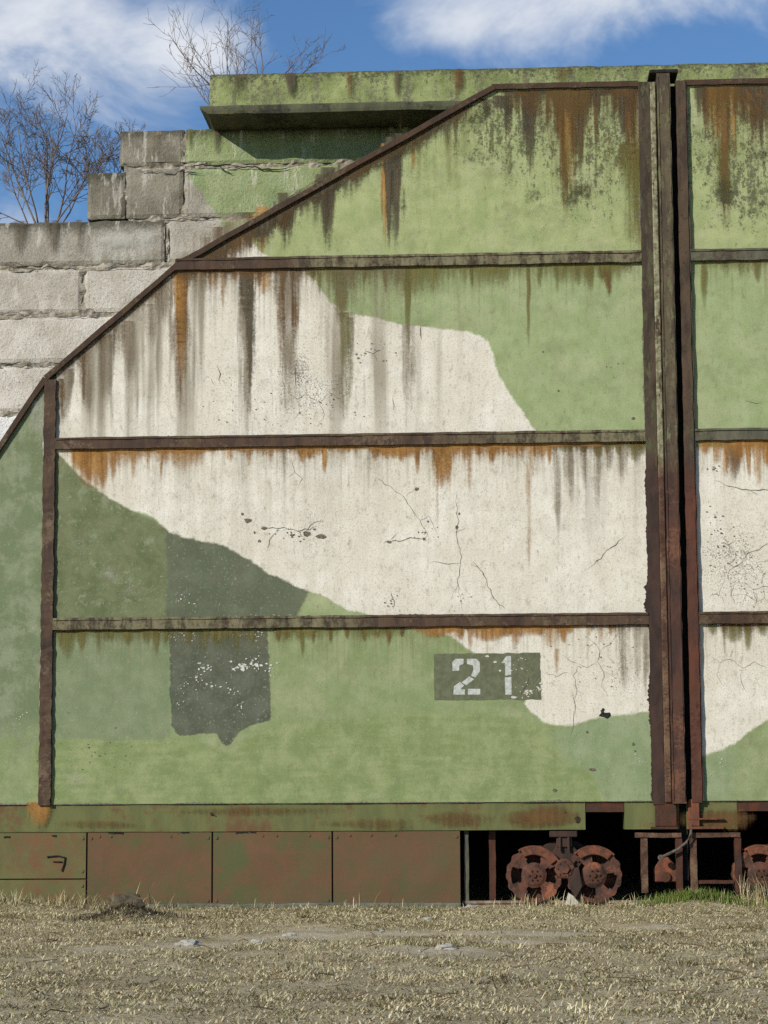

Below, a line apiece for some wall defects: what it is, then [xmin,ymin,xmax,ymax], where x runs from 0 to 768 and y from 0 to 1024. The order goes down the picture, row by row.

corrosion [546,90,587,187]
corrosion [620,143,640,237]
corrosion [703,85,768,207]
corrosion [151,193,315,395]
corrosion [601,268,611,292]
corrosion [68,351,86,395]
corrosion [72,442,646,486]
spalling [241,513,326,542]
crack [379,479,505,609]
crack [710,540,768,607]
crack [518,637,617,733]
spalling [524,674,653,823]